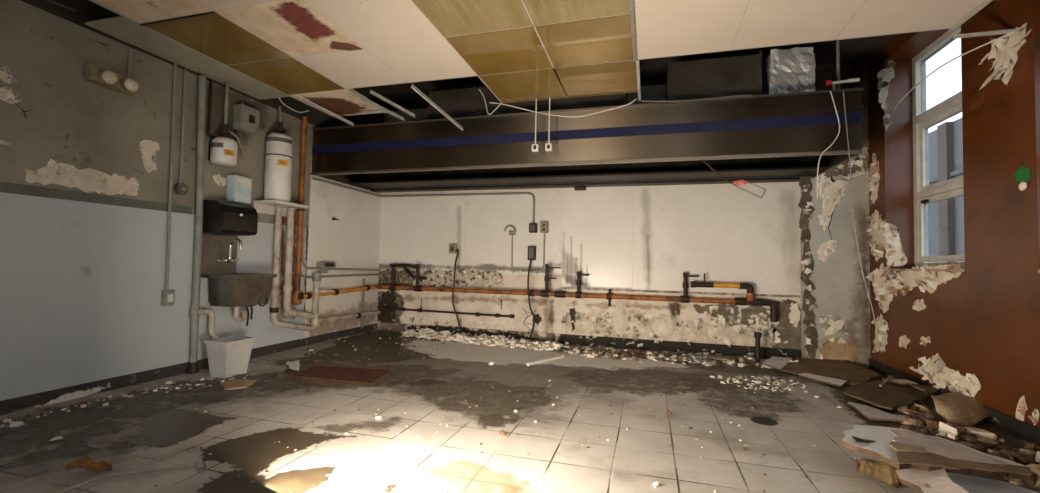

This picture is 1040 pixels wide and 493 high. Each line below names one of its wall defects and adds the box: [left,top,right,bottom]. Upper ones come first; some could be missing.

leakage [274,2,334,40]
peeling [0,66,23,104]
peeling [877,60,897,132]
peeling [978,22,1031,90]
peeling [25,140,160,196]
peeling [561,101,981,397]
flaking render [377,268,545,340]